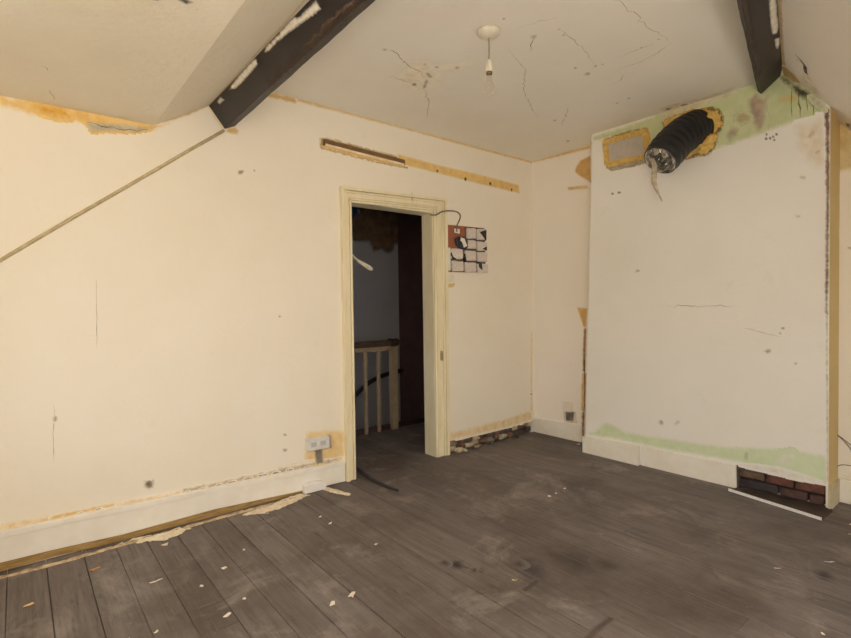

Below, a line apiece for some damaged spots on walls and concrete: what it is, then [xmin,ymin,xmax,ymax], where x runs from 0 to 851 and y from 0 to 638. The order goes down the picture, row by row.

peeling [0,95,173,135]
flaking render [208,107,240,136]
peeling [267,0,830,505]
peeling [0,428,345,530]